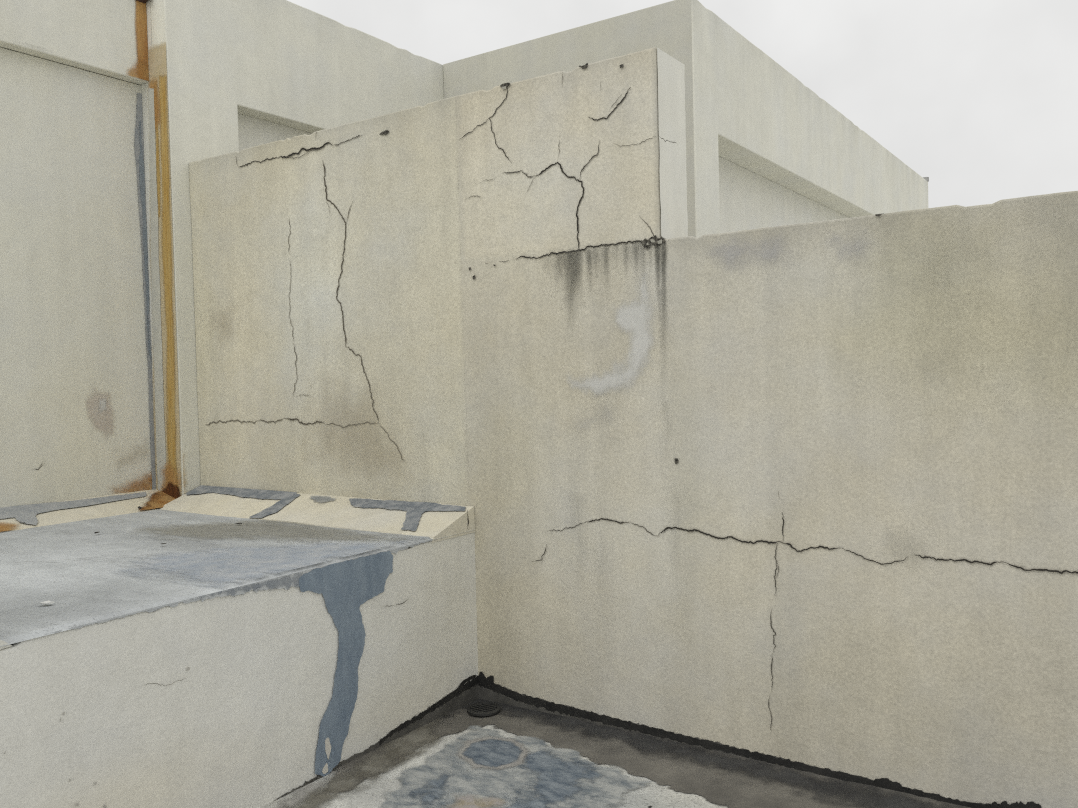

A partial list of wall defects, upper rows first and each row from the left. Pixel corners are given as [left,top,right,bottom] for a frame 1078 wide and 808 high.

rust [123,1,182,511]
crack [205,135,404,460]
crack [460,85,676,264]
water stain [655,242,666,282]
crack [532,491,1078,730]